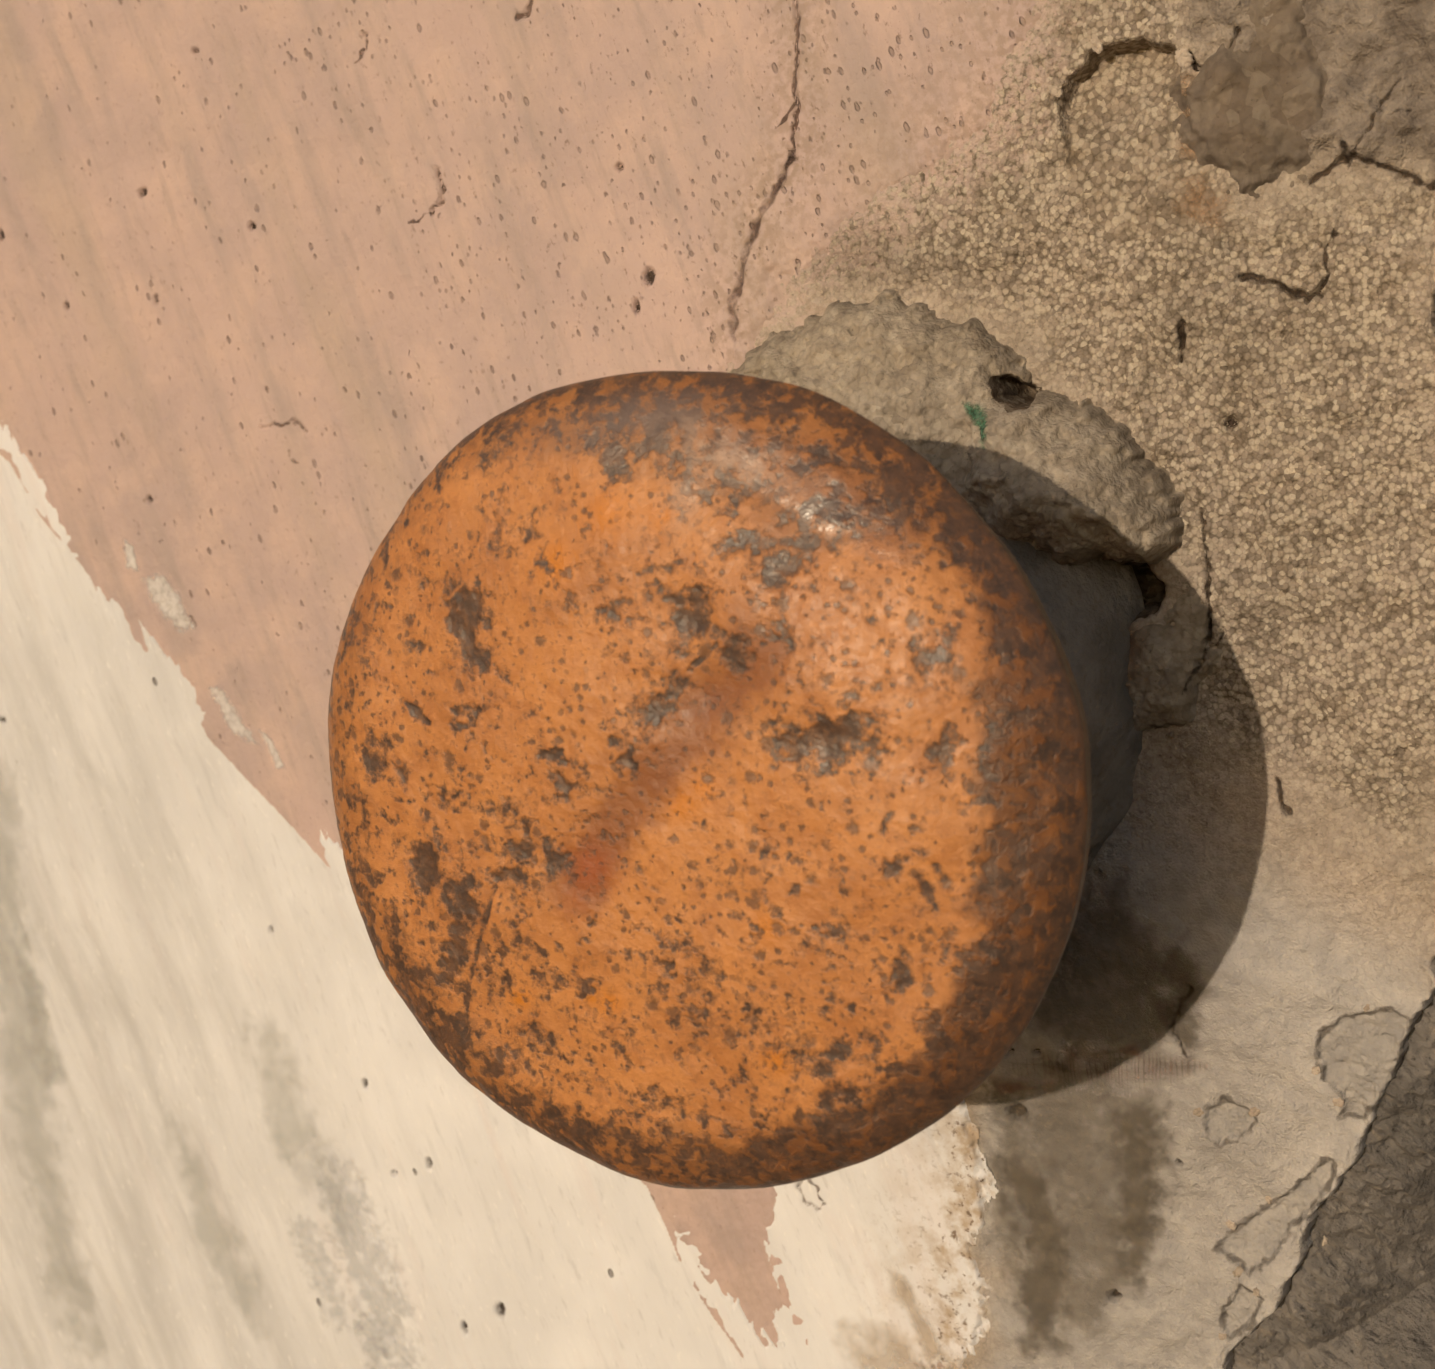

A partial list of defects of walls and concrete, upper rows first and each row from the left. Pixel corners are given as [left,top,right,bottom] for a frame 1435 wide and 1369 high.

crack [515,0,533,21]
crack [729,1,801,330]
crack [1240,229,1338,302]
spalling [1216,994,1435,1369]
peeling [649,1183,789,1348]